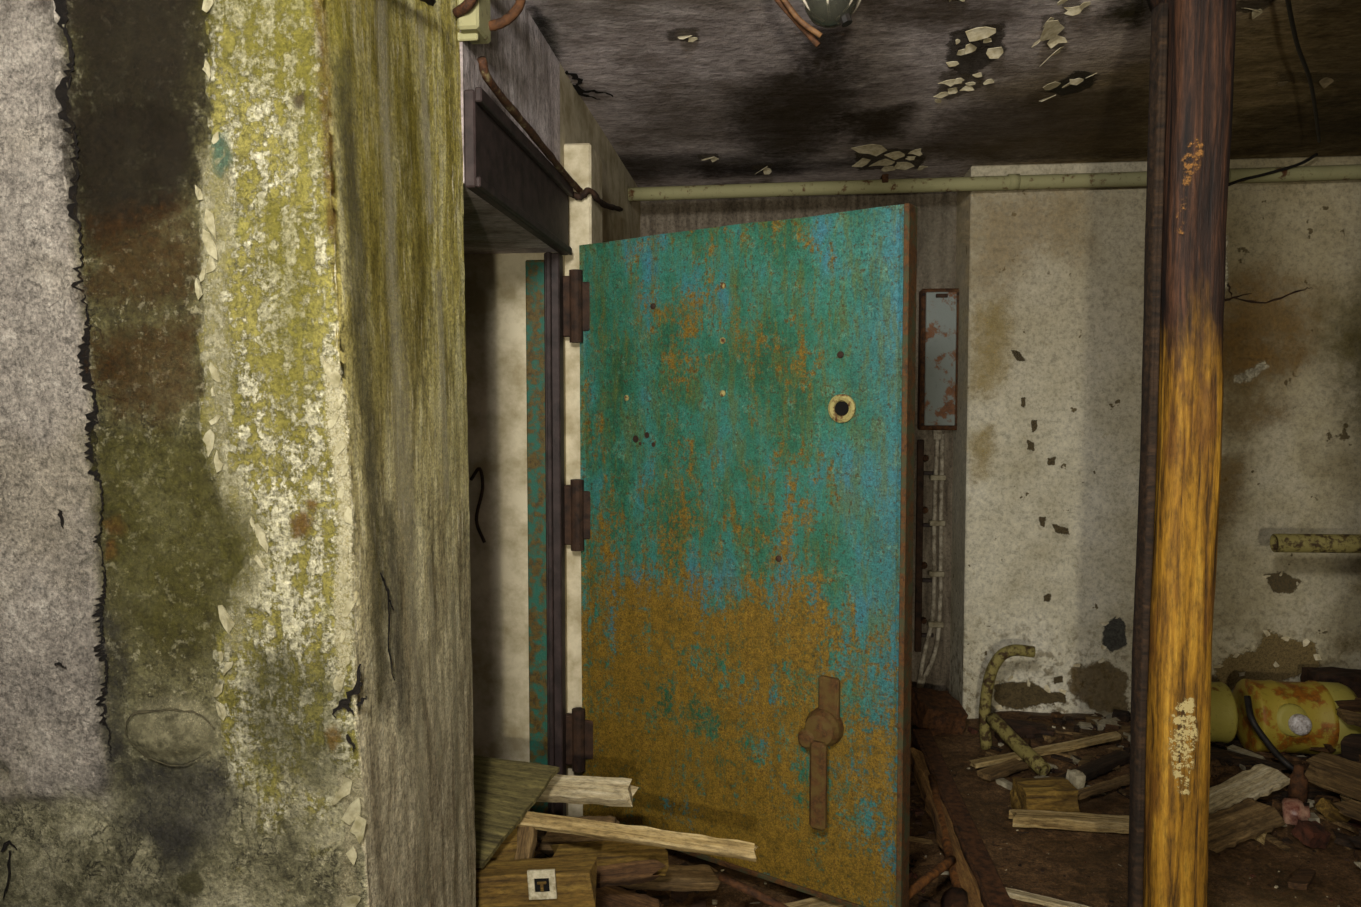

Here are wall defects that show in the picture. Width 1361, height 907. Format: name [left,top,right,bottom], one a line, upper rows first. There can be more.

water stain [532,11,556,53]
water stain [622,32,912,175]
peeling [933,23,1006,103]
water stain [927,92,1138,161]
peeling [1031,0,1091,66]
peeling [1039,71,1097,102]
peeling [851,144,928,172]
crack [1225,284,1311,304]
peeling [1021,397,1056,465]
peeling [1039,516,1070,535]
peeling [1262,571,1302,594]
peeling [1213,629,1322,691]